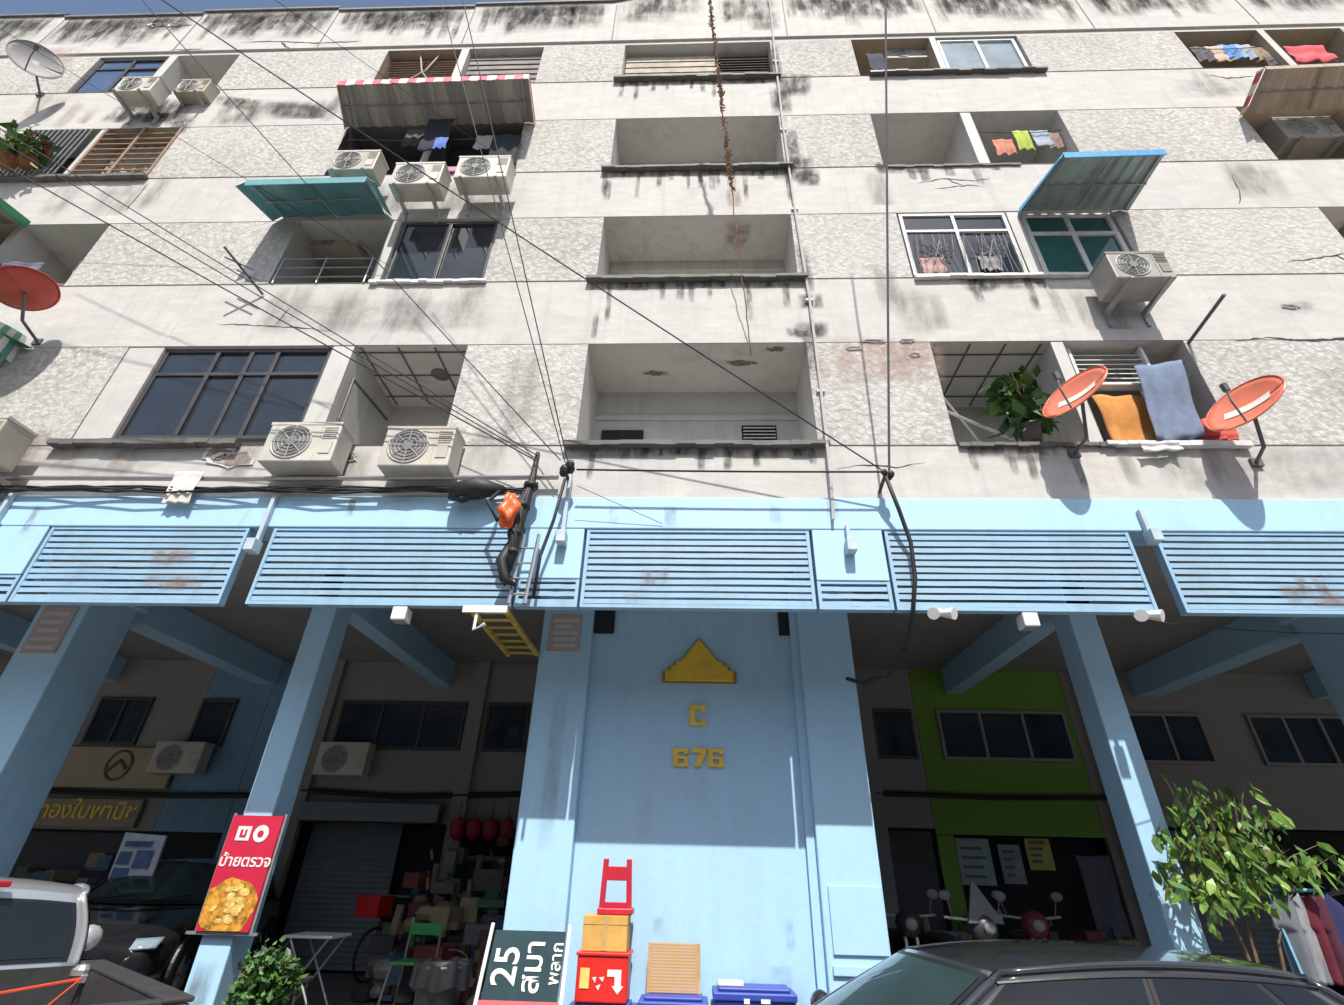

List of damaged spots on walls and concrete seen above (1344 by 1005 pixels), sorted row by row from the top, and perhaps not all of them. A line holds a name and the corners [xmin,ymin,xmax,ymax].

water stain [0,20,42,40]
water stain [61,18,186,38]
water stain [204,11,460,34]
water stain [483,5,604,30]
water stain [224,98,255,119]
water stain [272,103,321,117]
crack [919,178,990,189]
crack [1288,253,1344,262]